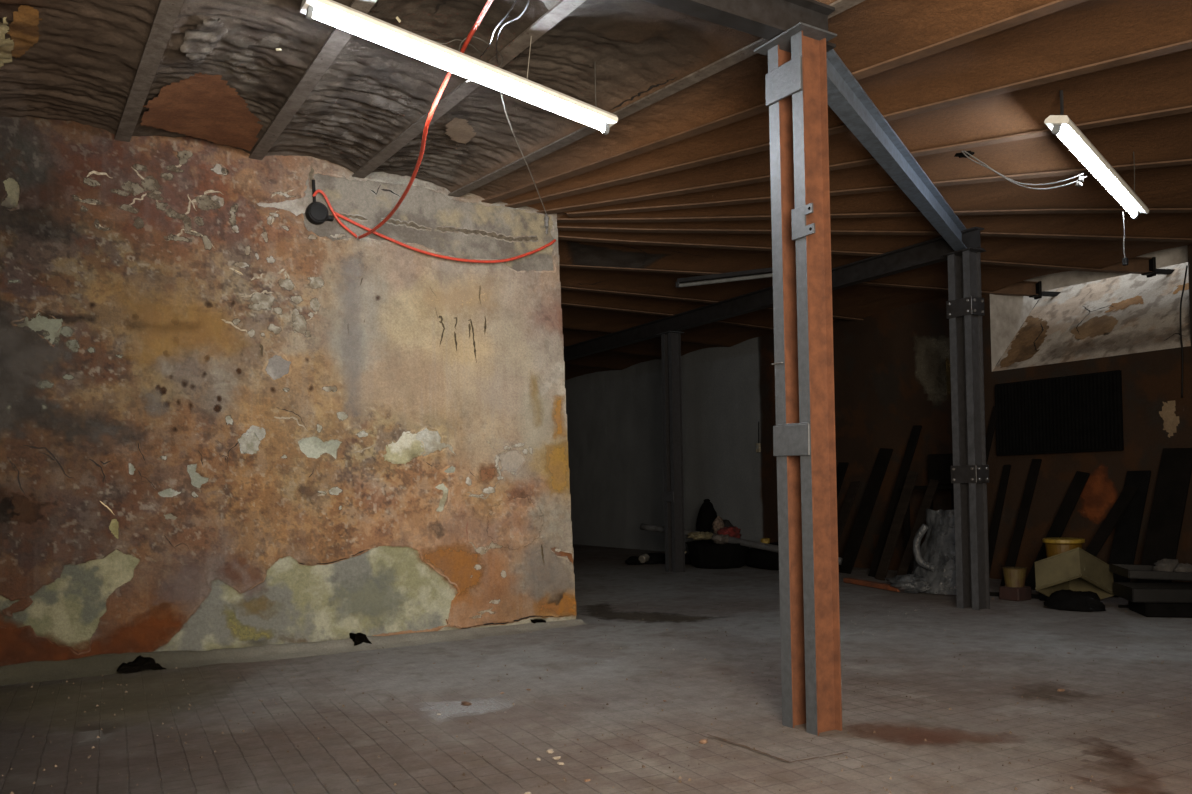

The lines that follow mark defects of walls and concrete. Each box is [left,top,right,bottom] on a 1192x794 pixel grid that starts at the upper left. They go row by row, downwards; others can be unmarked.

spalling [0,5,42,67]
spalling [1000,316,1049,368]
spalling [1070,295,1144,340]
peeling [298,435,345,463]
spalling [384,426,455,512]
rust [479,464,496,483]
rust [547,398,569,492]
peeling [0,516,142,655]
peeling [117,544,576,674]
rust [423,547,483,594]
rust [537,593,577,616]
rust [0,611,181,664]